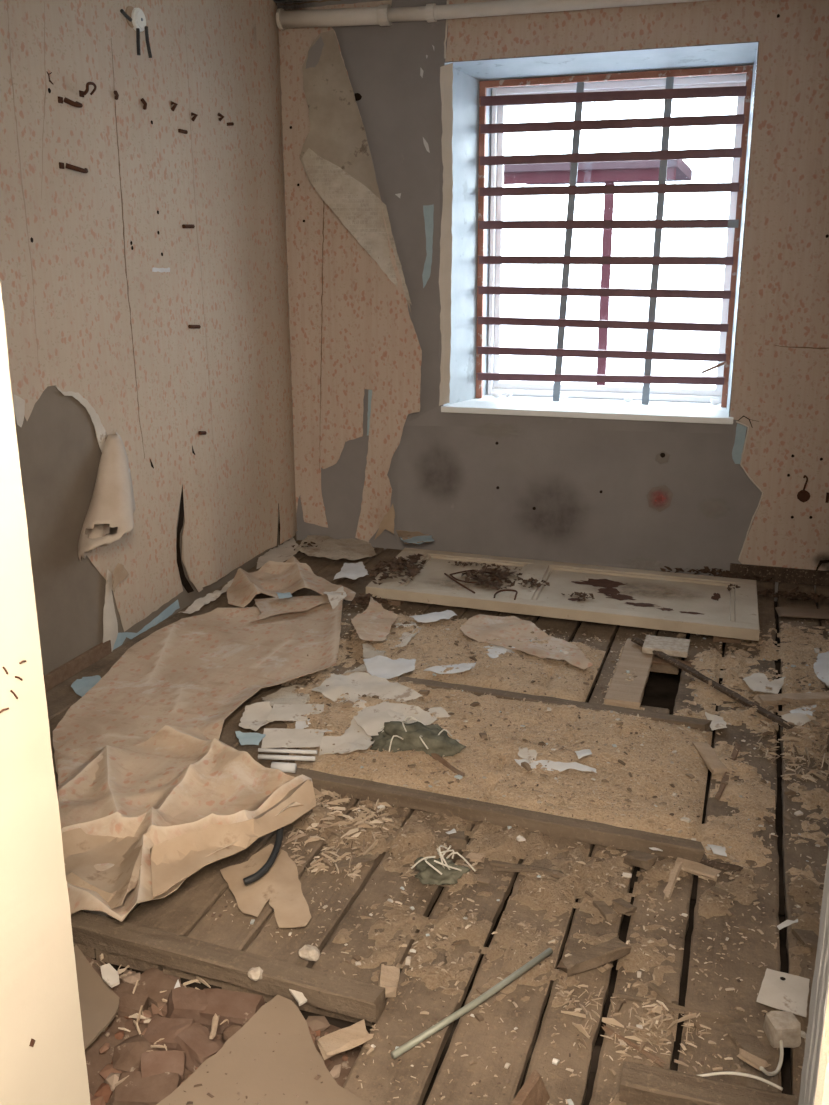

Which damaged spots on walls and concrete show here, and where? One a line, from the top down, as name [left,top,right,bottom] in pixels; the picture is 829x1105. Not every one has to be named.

flaking render [391,0,447,8]
flaking render [333,19,762,572]
flaking render [14,385,126,675]
peeling [571,578,702,614]